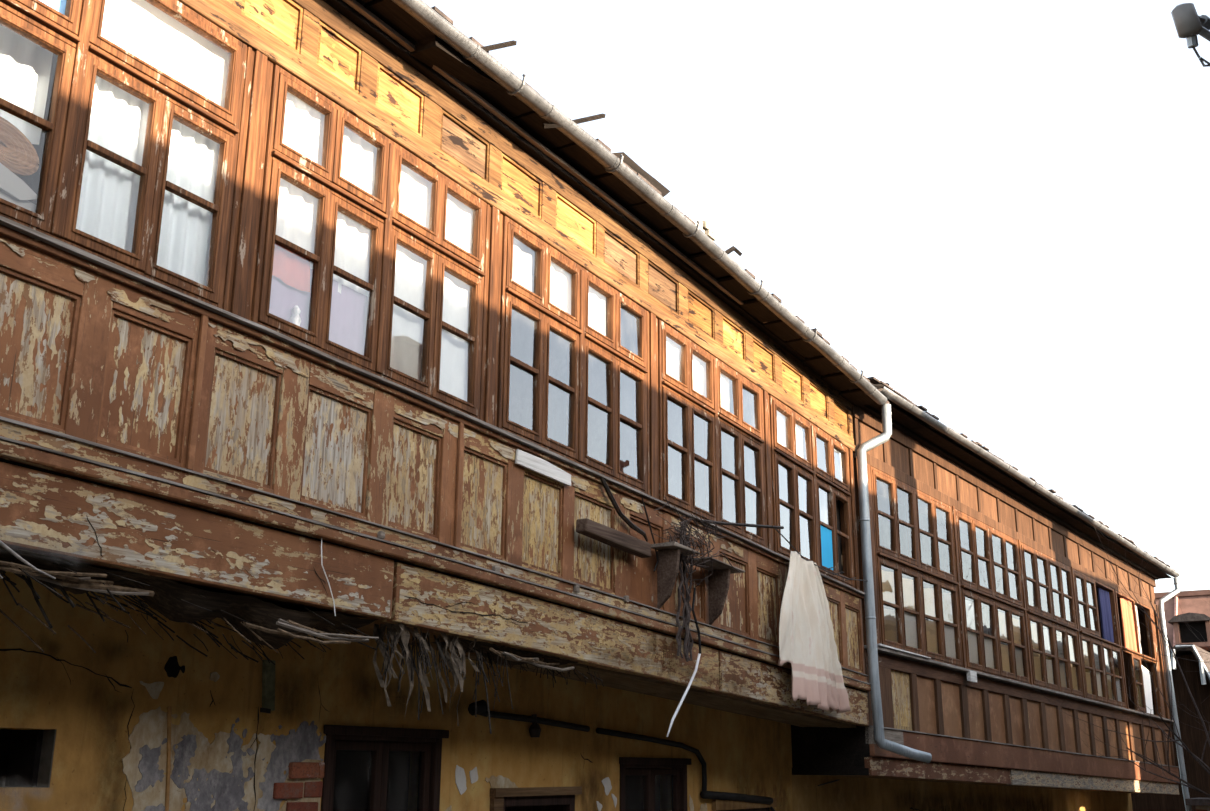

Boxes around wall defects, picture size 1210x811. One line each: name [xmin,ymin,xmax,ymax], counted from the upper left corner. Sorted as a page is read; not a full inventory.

peeling [0,239,27,256]
peeling [0,273,67,419]
peeling [25,435,80,452]
peeling [74,268,95,282]
peeling [101,288,366,532]
peeling [385,409,559,584]
peeling [0,472,867,724]
peeling [122,656,326,811]